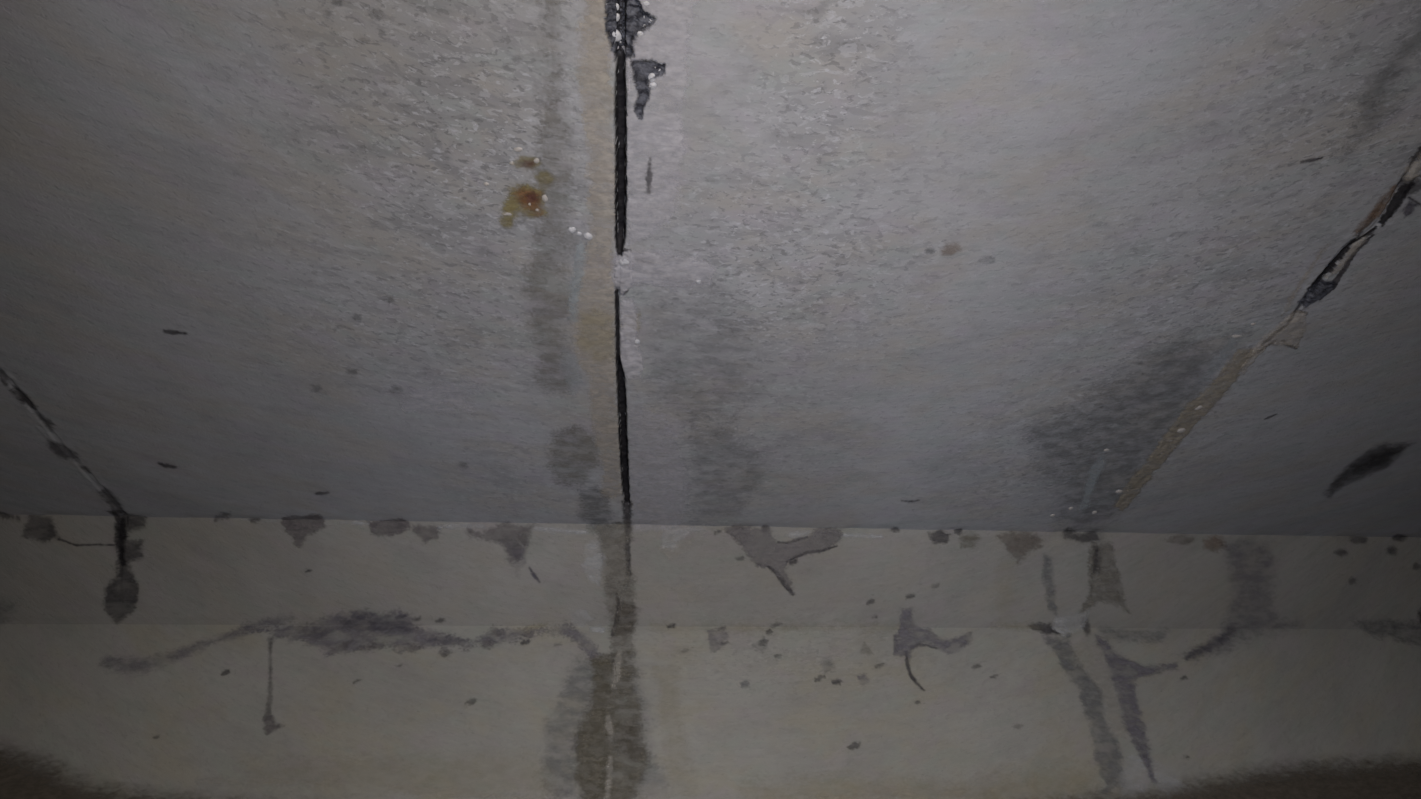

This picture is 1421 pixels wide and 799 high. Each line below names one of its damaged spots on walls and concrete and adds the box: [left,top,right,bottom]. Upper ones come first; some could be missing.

spalling [605,0,666,119]
crack [614,0,627,255]
rust [502,184,547,226]
crack [1262,147,1421,345]
crack [13,387,36,409]
crack [51,443,75,458]
crack [611,289,632,636]
damp [26,511,144,618]
peeling [728,526,843,595]
damp [1032,530,1421,799]
damp [0,751,149,799]